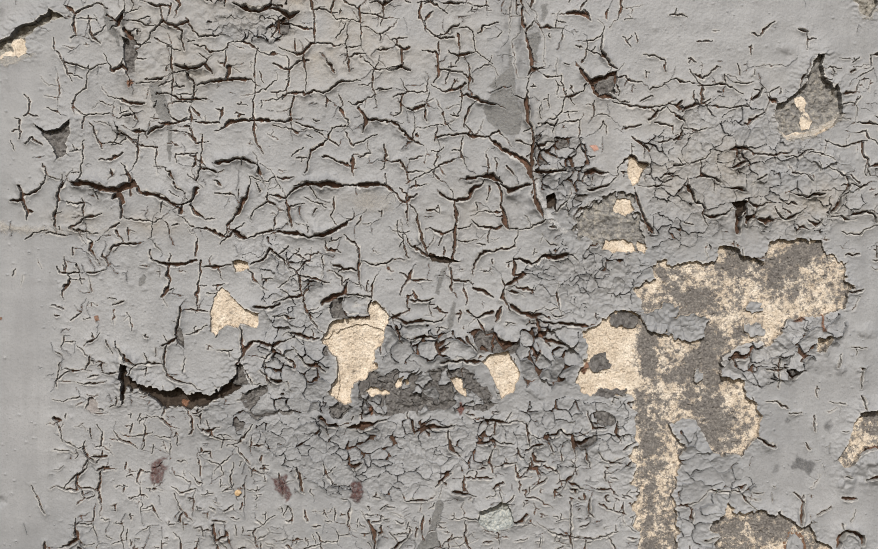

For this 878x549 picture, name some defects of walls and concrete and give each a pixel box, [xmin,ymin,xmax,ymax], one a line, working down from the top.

spalling [0,10,63,60]
crack [797,27,819,90]
spalling [853,0,878,17]
crack [625,51,878,261]
crack [9,0,799,416]
crack [870,242,878,272]
spalling [120,54,871,549]
crack [847,288,866,312]
crack [30,485,47,517]
crack [41,392,640,549]
crack [676,346,878,549]
spalling [838,410,878,468]